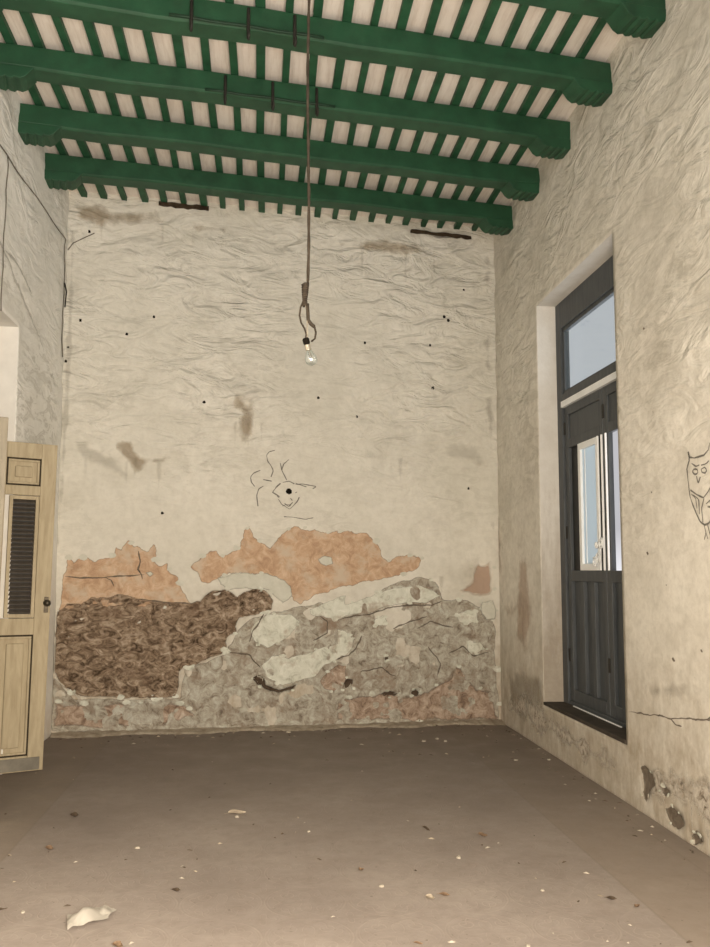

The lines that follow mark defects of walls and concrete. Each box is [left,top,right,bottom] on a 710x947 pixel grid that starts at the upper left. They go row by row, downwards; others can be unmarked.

flaking render [51,526,502,732]
crack [634,712,710,727]